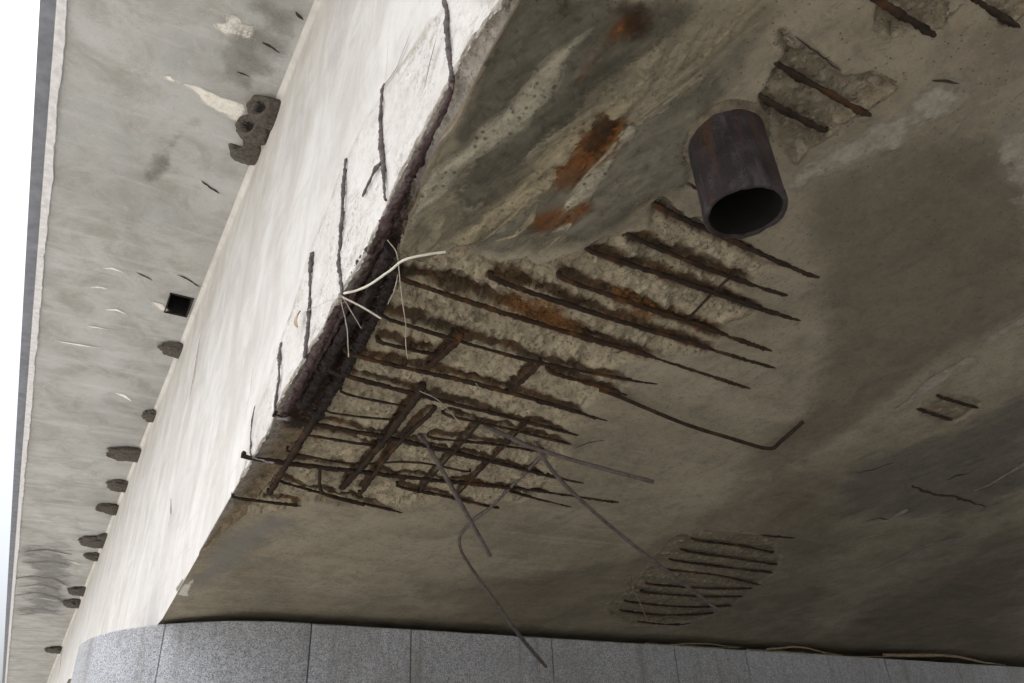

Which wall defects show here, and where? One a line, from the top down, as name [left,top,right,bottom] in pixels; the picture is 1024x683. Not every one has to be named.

leakage [406,0,738,251]
corrosion [556,115,625,187]
corrosion [533,201,590,230]
corrosion [504,292,576,331]
spalling [197,0,1024,560]
corrosion [612,286,662,315]
crack [912,473,986,507]
leakage [26,548,78,614]
spalling [601,527,787,628]